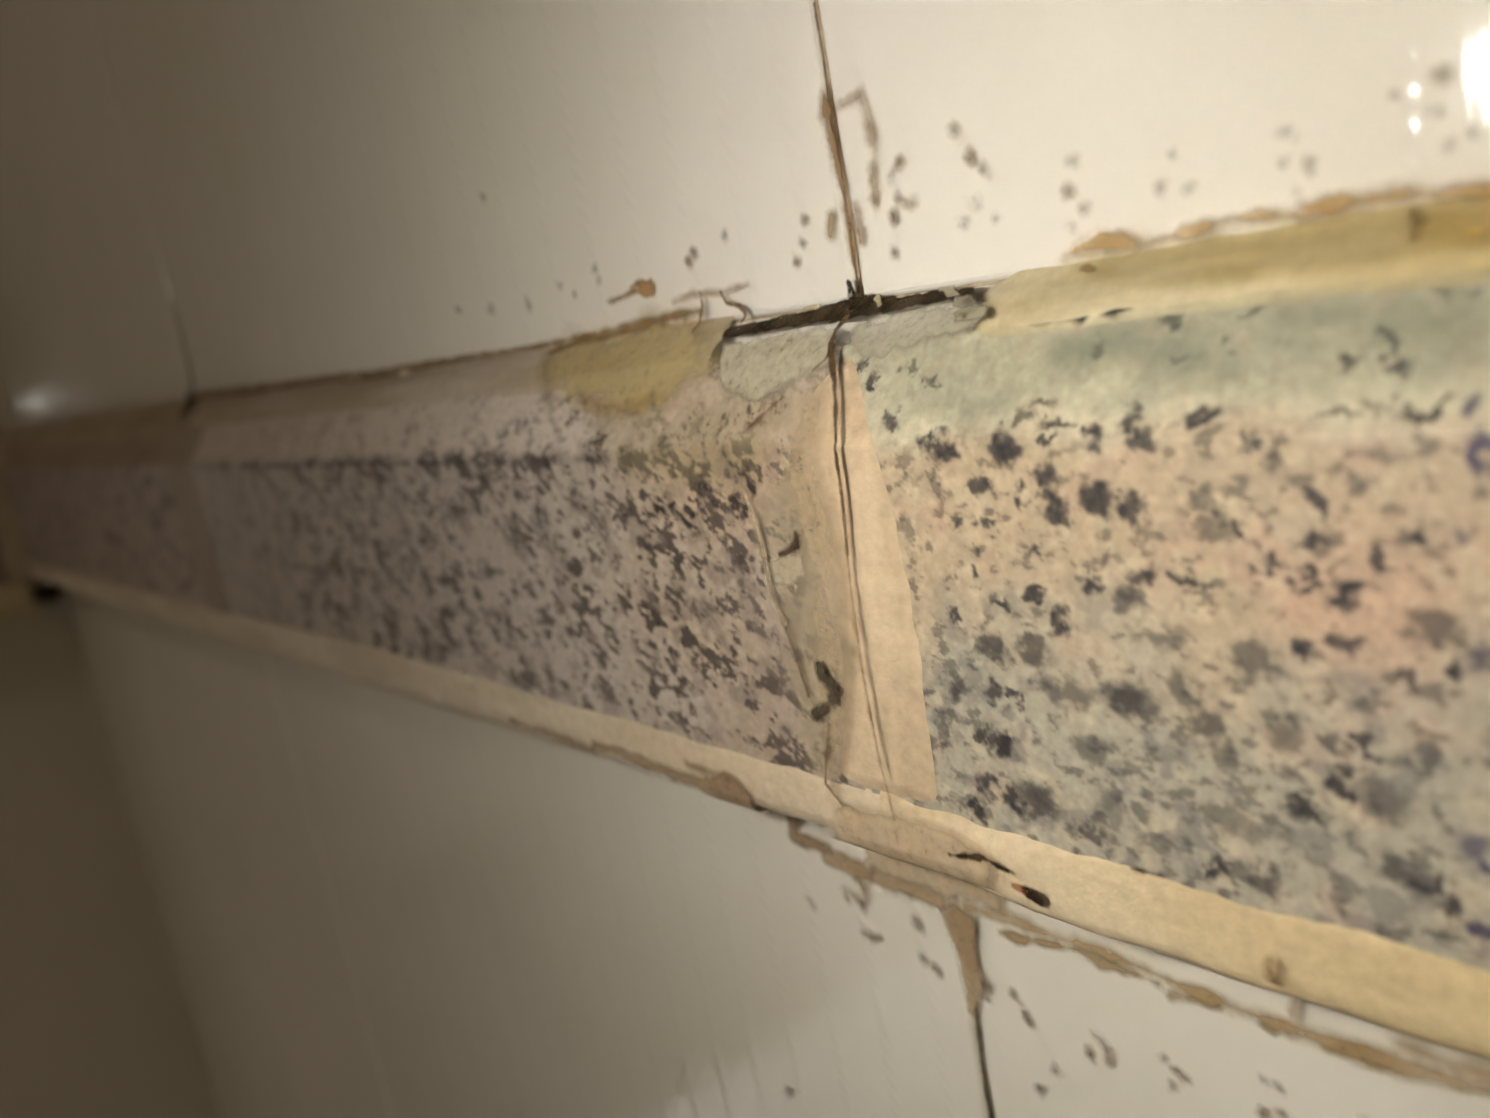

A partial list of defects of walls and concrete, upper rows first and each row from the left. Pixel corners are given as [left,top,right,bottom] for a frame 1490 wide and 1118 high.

water stain [1070,231,1136,272]
water stain [1174,221,1213,239]
water stain [1232,210,1278,220]
water stain [1297,182,1490,238]
water stain [548,310,707,412]
crack [686,2,984,813]
spalling [719,286,987,429]
water stain [1075,308,1129,322]
peeling [749,399,854,810]
water stain [509,718,1490,1094]